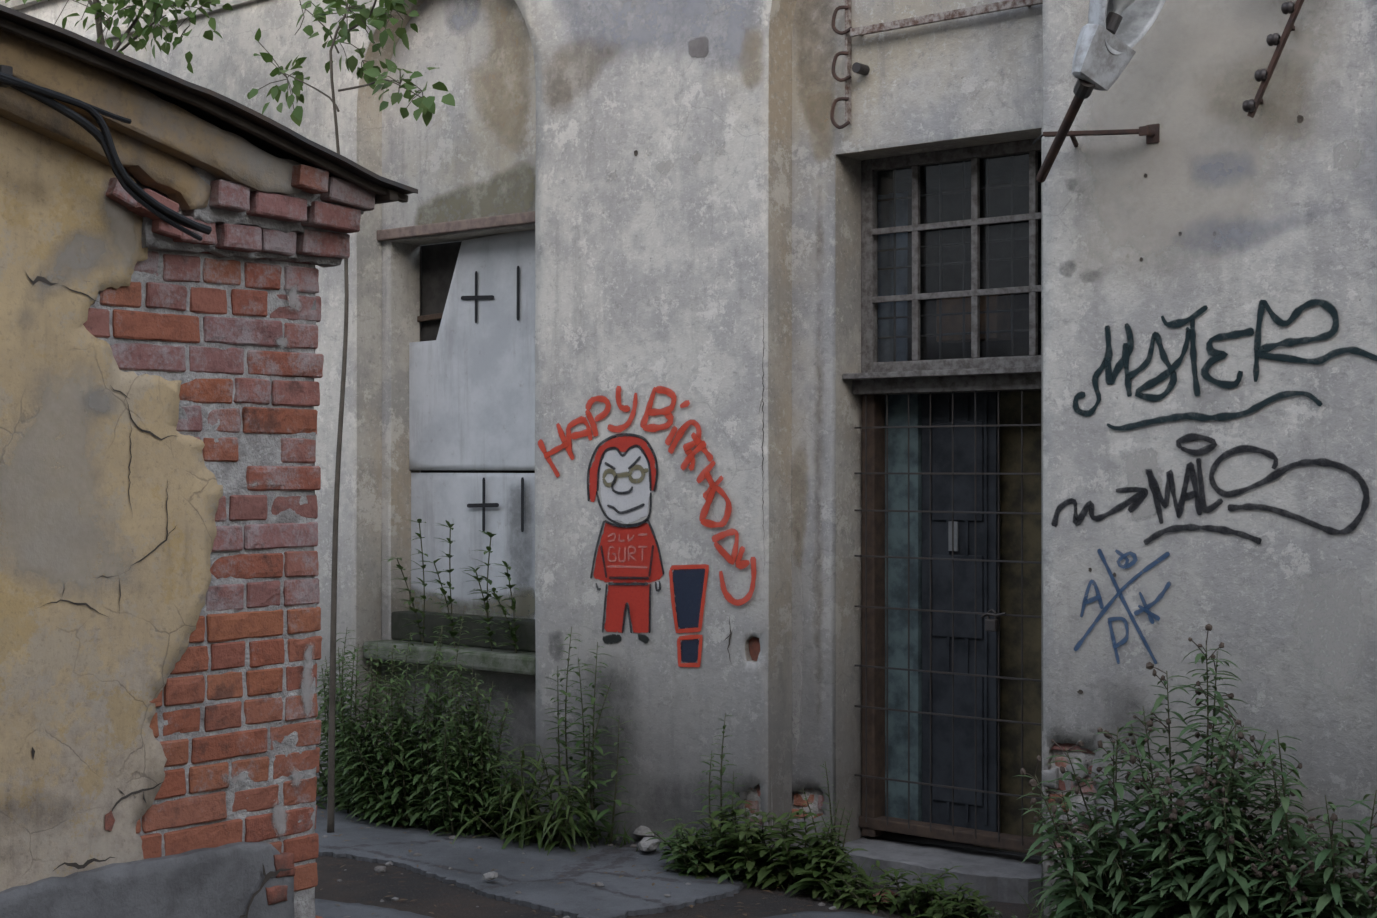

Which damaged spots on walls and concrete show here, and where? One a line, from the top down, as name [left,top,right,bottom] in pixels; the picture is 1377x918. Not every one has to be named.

crack [110,385,174,514]
crack [41,480,176,617]
spalling [83,164,376,918]
spalling [749,637,760,661]
crack [53,782,163,871]
spalling [792,788,824,819]
spalling [1041,731,1124,871]